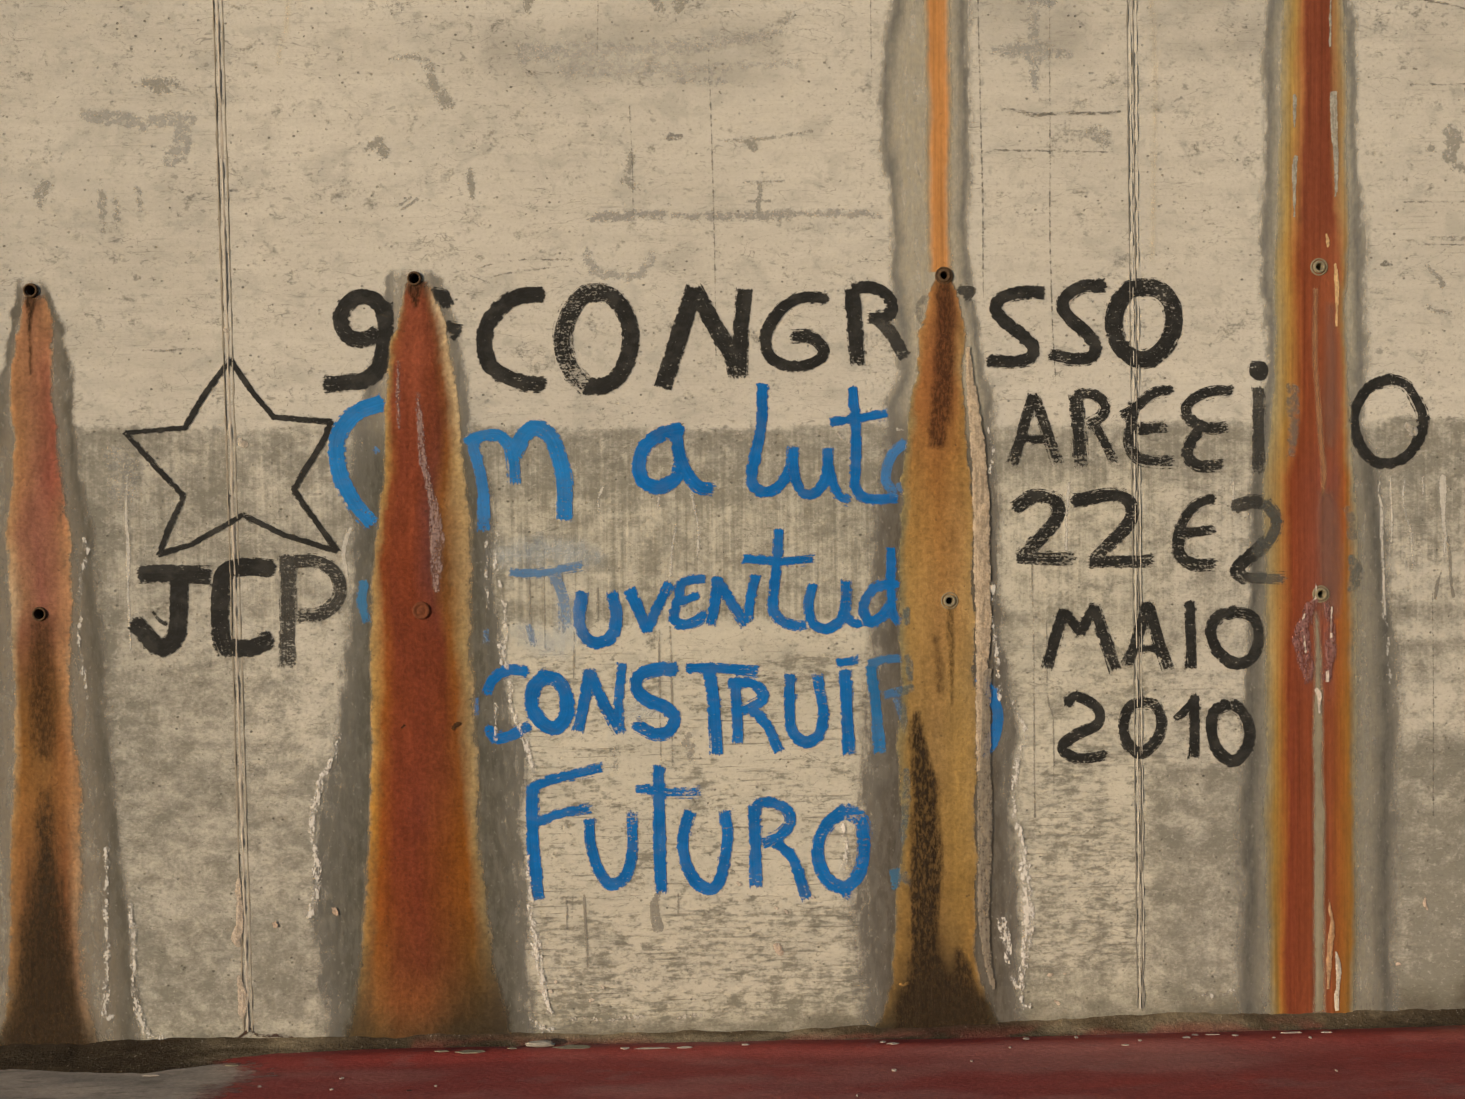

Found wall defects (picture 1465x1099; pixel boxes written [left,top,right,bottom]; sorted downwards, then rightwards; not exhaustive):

corrosion [0,295,98,1046]
corrosion [345,281,512,1038]
corrosion [875,0,998,1029]
leakage [839,0,1035,1026]
corrosion [1249,0,1362,1015]